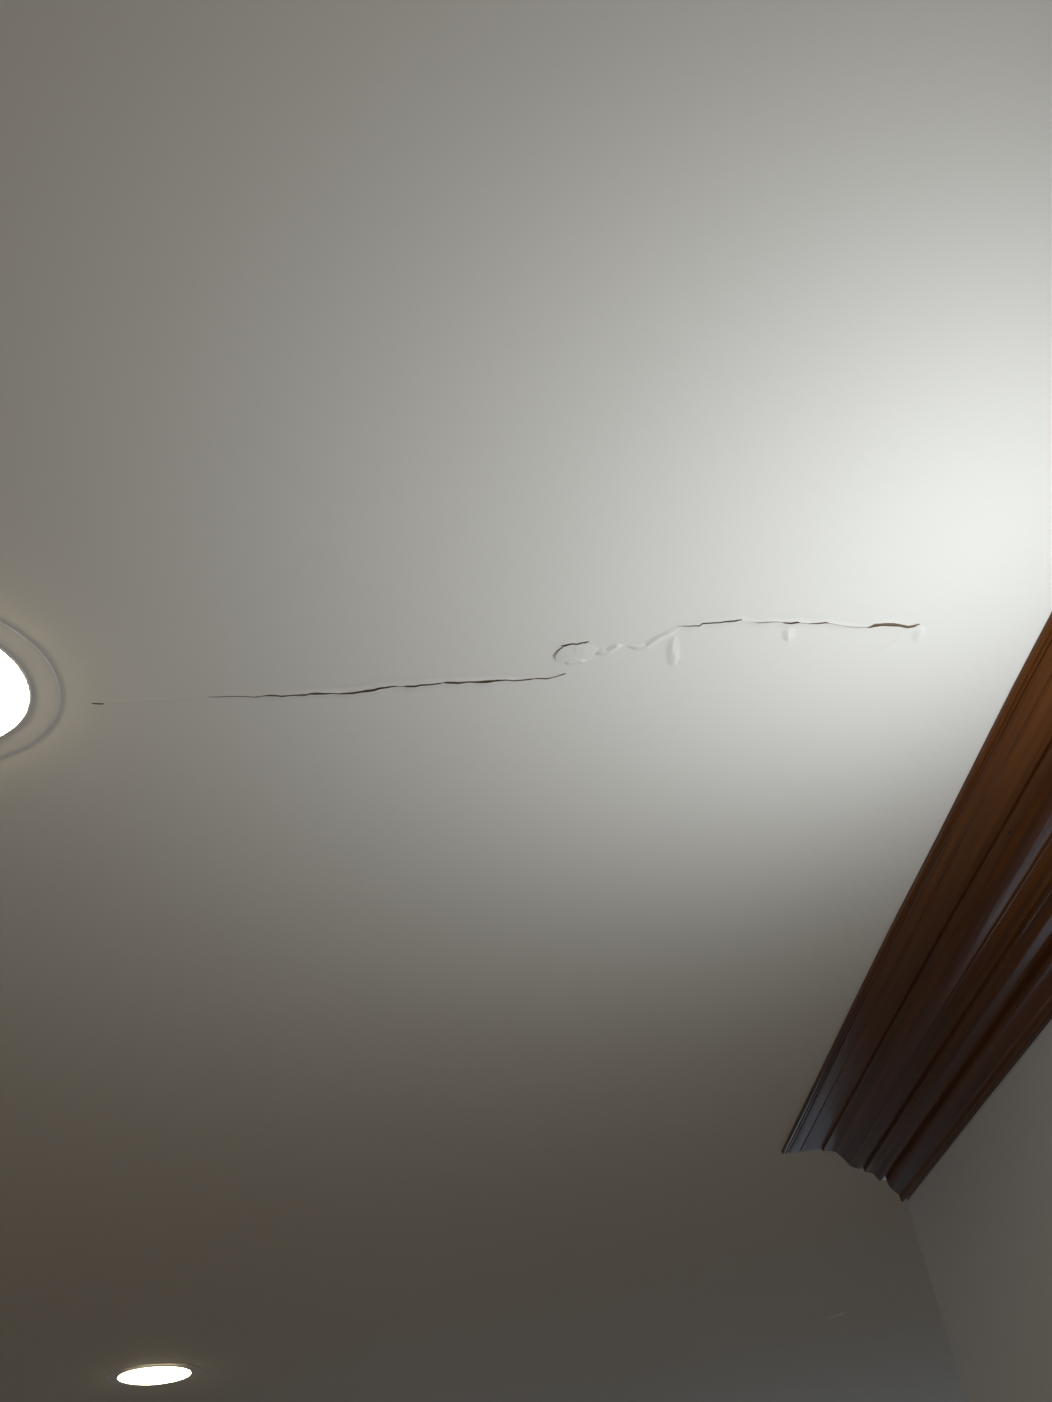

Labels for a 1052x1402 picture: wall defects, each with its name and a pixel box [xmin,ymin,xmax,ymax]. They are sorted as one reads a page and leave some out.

crack [676,614,920,636]
crack [92,672,568,705]